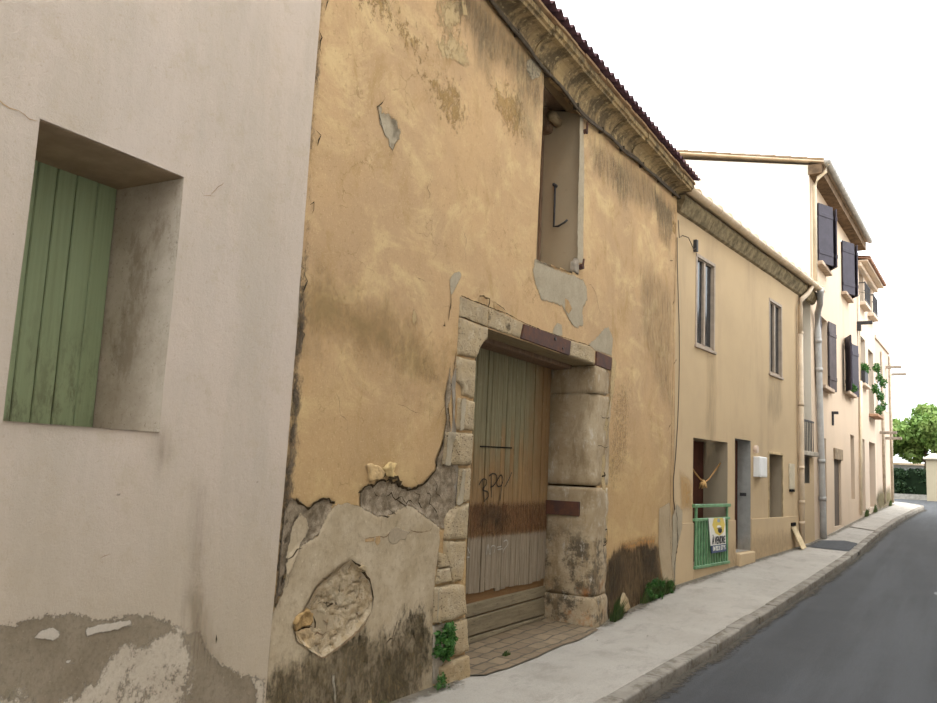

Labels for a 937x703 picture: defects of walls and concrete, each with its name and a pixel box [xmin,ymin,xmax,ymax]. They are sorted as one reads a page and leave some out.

flaking render [377,102,401,150]
peeling [359,0,474,134]
peeling [490,78,523,136]
peeling [360,369,457,529]
peeling [277,498,336,597]
flaking render [293,560,374,659]
water stain [604,538,662,619]
peeling [0,612,265,703]
water stain [266,611,431,703]